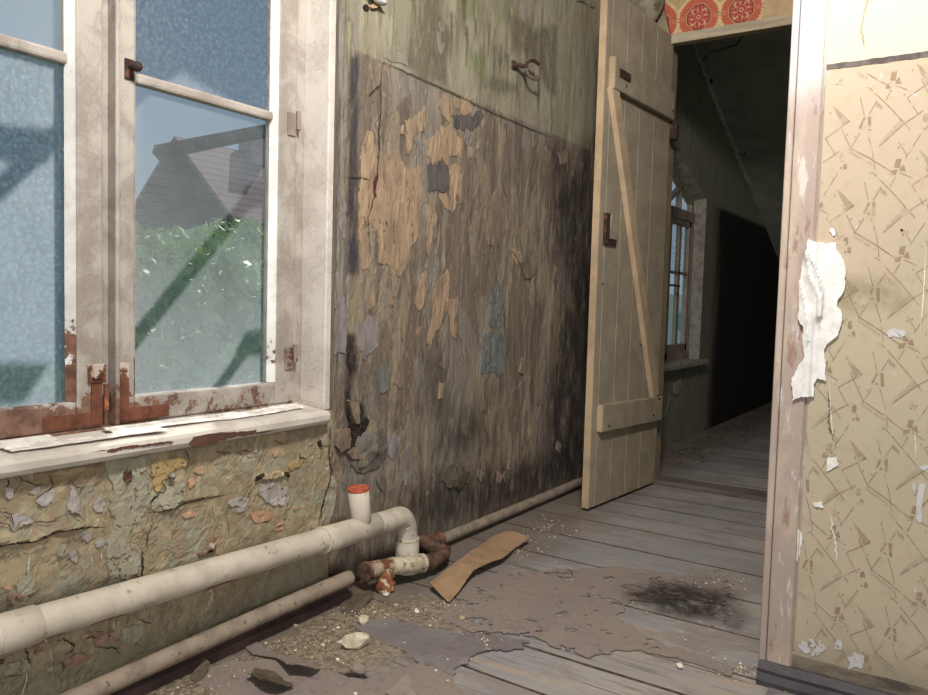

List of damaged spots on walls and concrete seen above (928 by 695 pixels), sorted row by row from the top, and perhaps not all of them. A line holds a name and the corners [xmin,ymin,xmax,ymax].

peeling [339,197,347,240]
peeling [358,94,484,345]
peeling [358,292,378,360]
spalling [346,404,370,448]
crack [216,439,305,459]
crack [7,476,83,499]
crack [304,425,332,521]
crack [0,511,105,557]
crack [133,480,274,579]
water stain [633,584,727,618]
crack [0,636,120,680]
peeling [834,640,864,670]